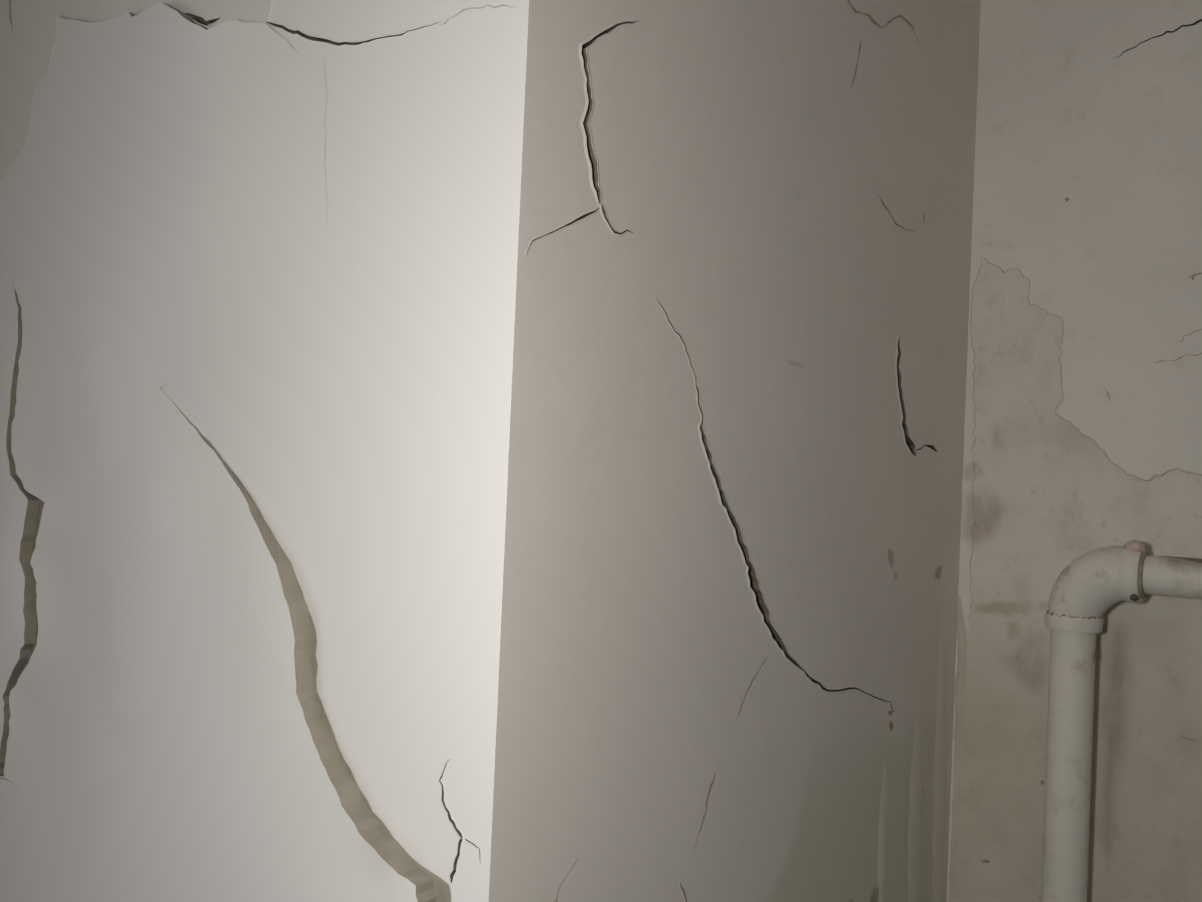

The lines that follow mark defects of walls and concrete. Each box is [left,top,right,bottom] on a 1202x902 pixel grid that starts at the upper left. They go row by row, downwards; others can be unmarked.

crack [847,0,919,87]
crack [1114,17,1202,59]
crack [525,19,639,256]
crack [895,335,938,457]
crack [32,498,45,554]
crack [199,432,272,532]
crack [655,298,894,732]
peeling [948,255,1202,902]
crack [22,610,38,672]
crack [296,579,482,902]